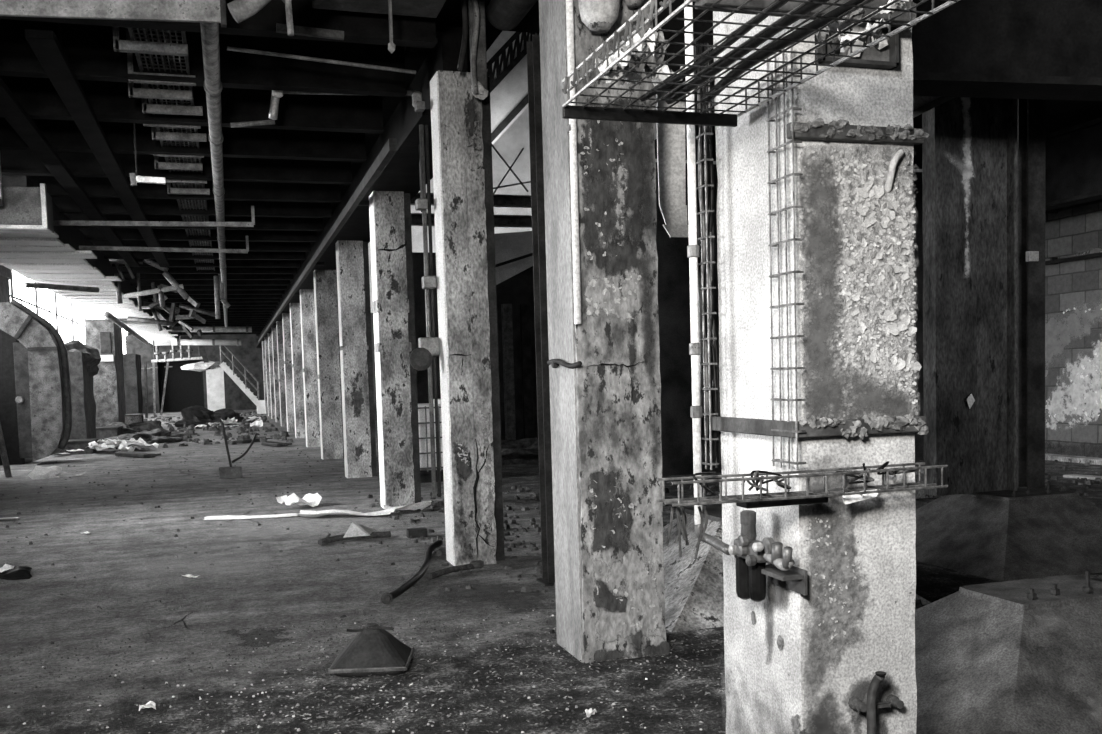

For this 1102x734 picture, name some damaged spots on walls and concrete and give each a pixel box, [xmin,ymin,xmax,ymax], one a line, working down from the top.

water stain [947,97,973,275]
water stain [628,261,655,388]
peeling [798,144,922,421]
peeling [1045,303,1102,430]
crack [473,439,495,556]
peeling [589,470,664,642]
water stain [810,475,854,599]
water stain [806,625,848,734]